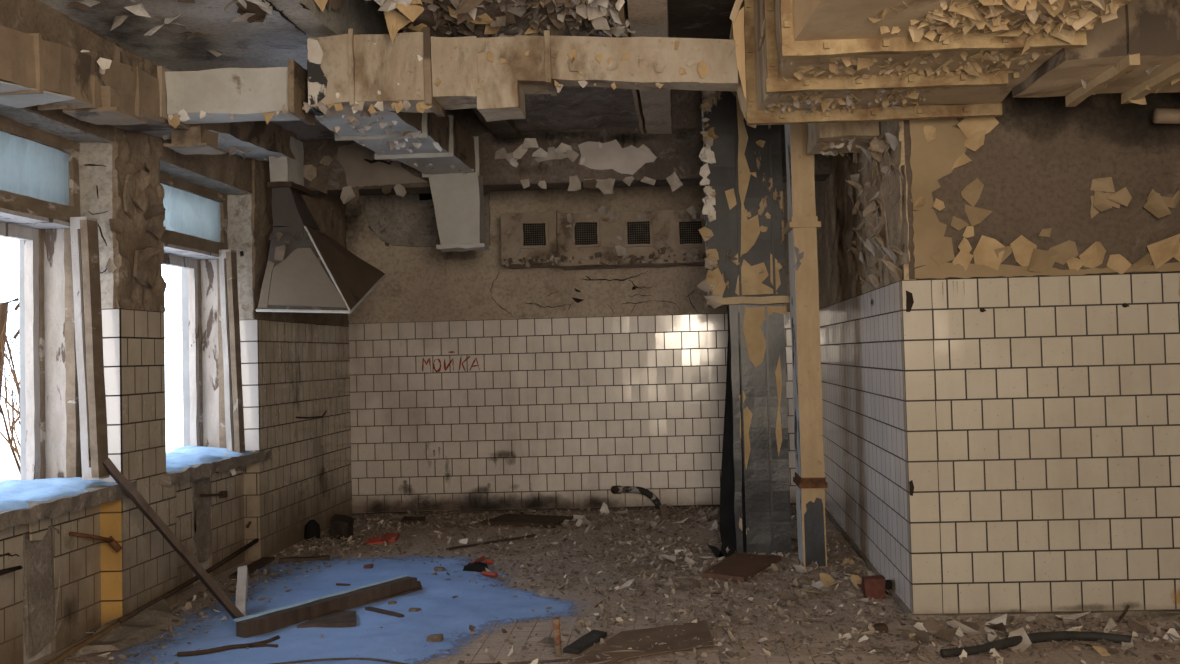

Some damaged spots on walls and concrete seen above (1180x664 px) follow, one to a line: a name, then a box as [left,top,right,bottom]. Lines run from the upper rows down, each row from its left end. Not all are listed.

peeling [110,0,206,40]
flaking render [224,0,273,23]
peeling [374,0,636,88]
peeling [106,163,166,290]
peeling [495,138,683,195]
peeling [697,101,748,309]
peeling [820,117,1180,312]